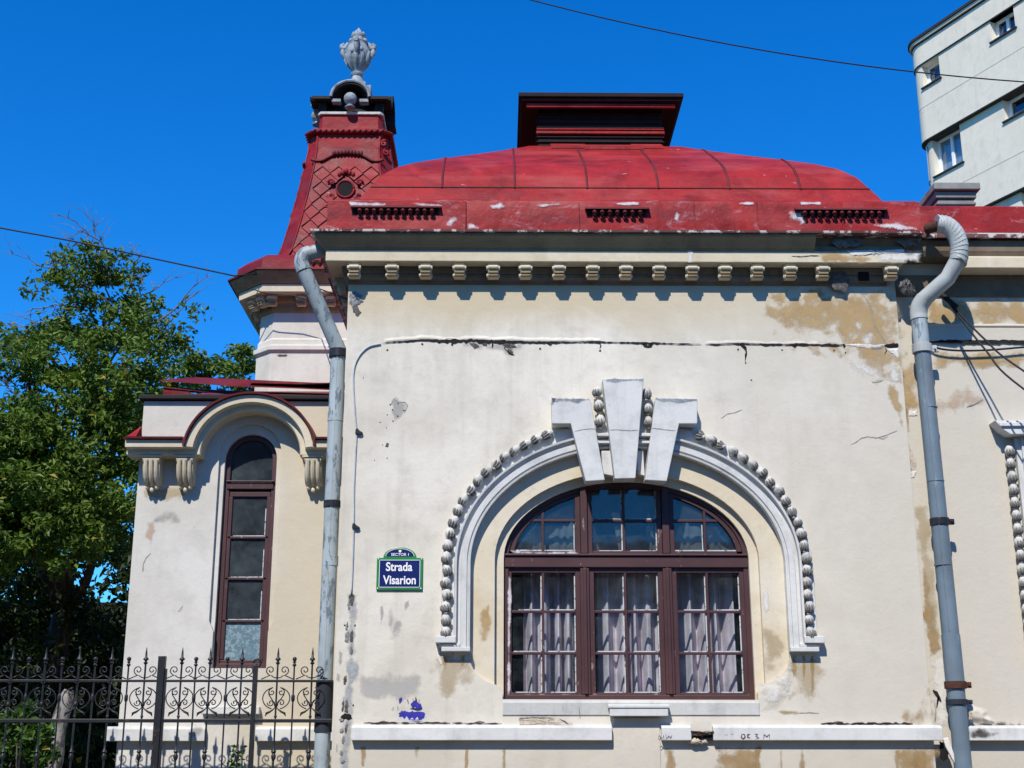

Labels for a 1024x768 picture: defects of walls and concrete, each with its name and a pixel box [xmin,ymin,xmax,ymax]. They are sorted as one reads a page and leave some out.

crack [384,335,846,381]
spalling [872,343,899,358]
peeling [380,399,408,428]
water stain [916,507,940,652]
spalling [336,594,358,767]